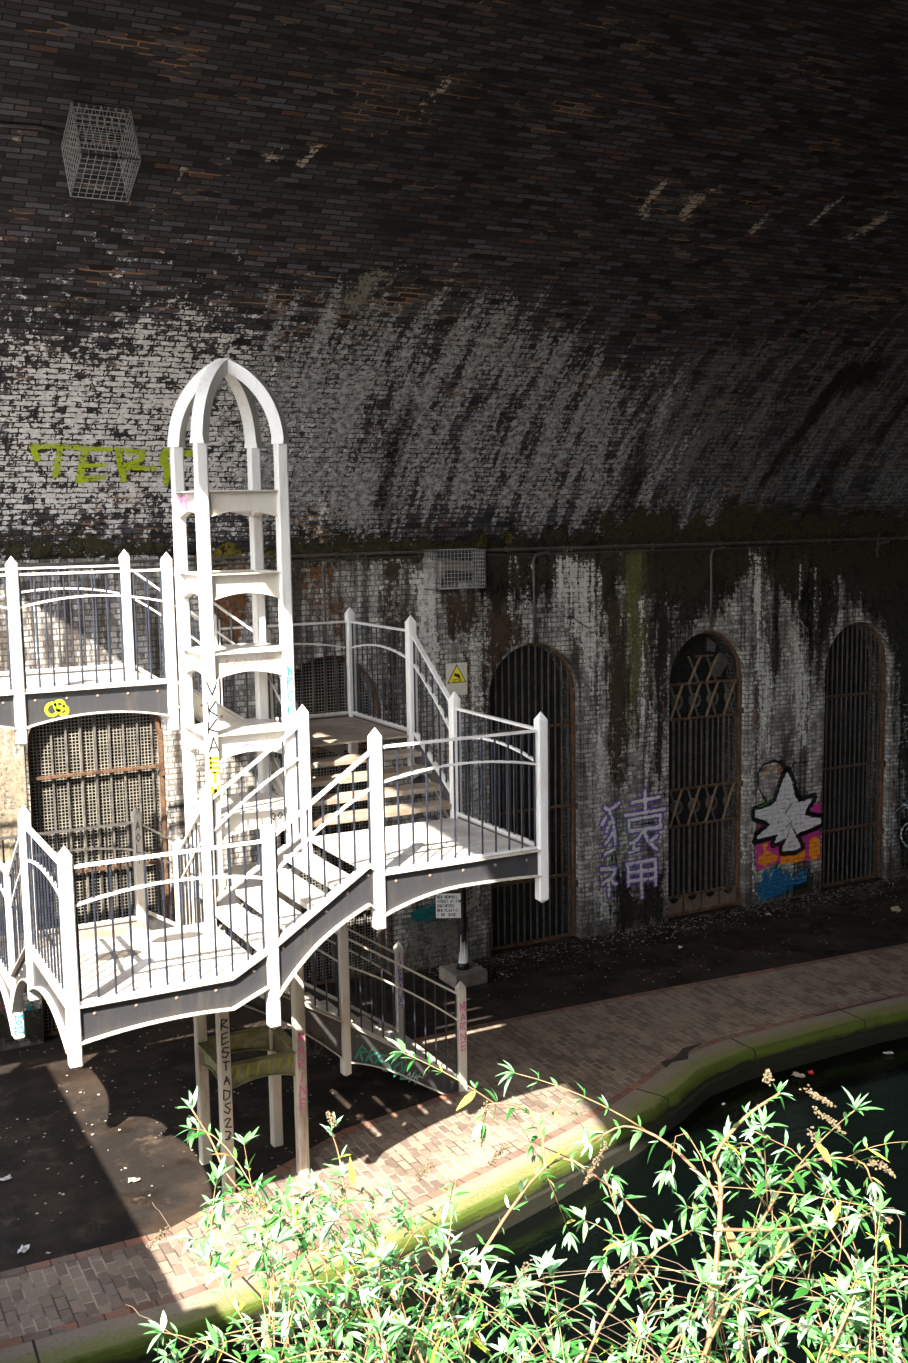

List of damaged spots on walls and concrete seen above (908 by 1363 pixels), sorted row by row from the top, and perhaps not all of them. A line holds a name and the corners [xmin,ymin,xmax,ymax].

water stain [212,541,242,563]
water stain [264,351,908,930]
water stain [0,1006,43,1045]